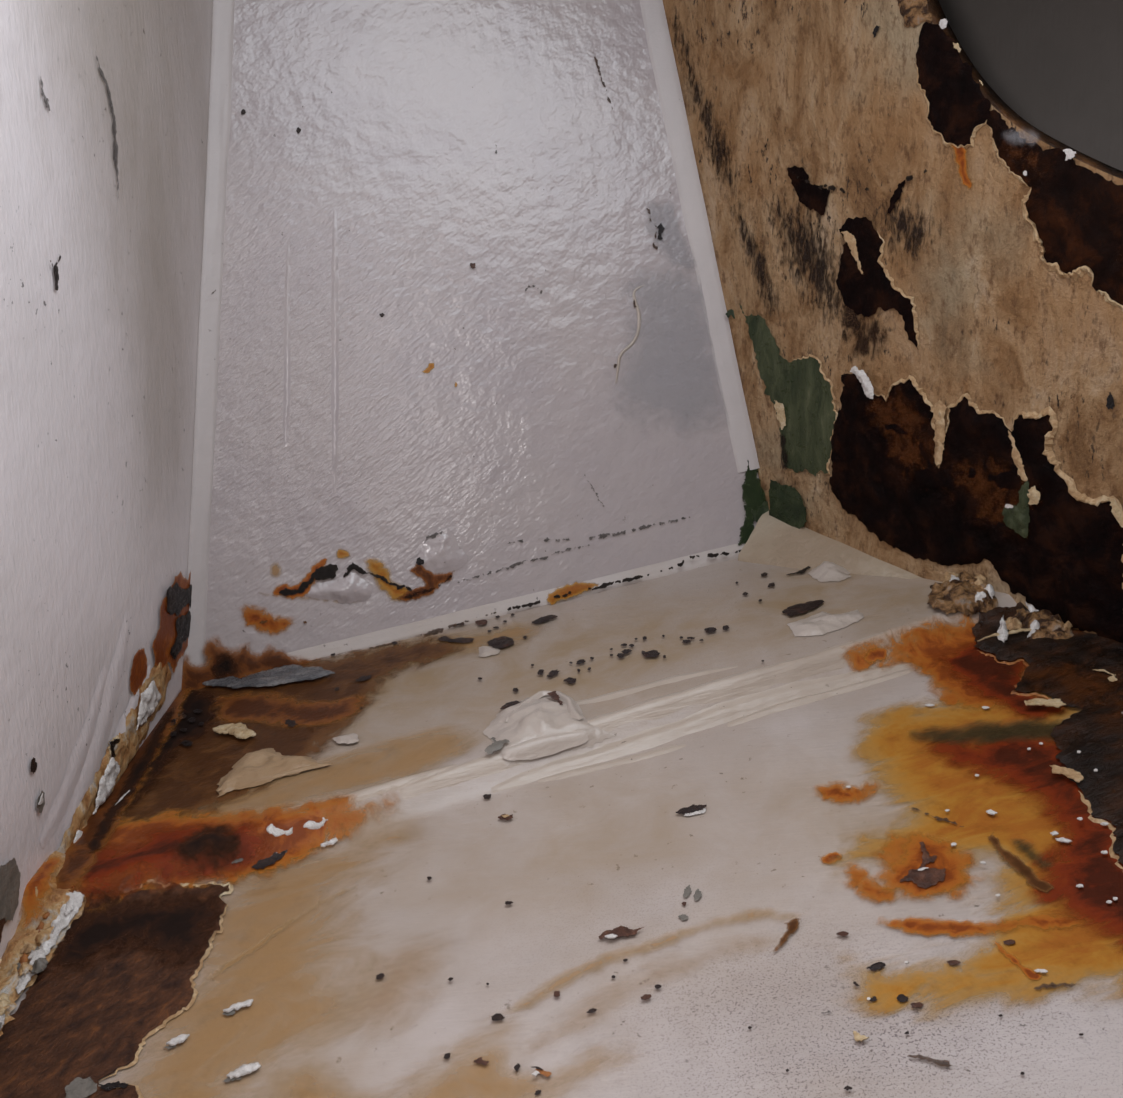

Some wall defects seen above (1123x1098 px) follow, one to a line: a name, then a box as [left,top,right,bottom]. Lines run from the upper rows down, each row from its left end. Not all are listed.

crack [96,56,119,190]
spalling [916,18,1123,312]
spalling [0,662,234,1098]
peeling [213,722,256,739]
corrosion [55,571,544,1098]
corrosion [522,932,682,1006]
corrosion [774,918,800,951]
peeling [782,600,824,616]
corrosion [816,614,1123,1014]
spalling [829,217,1123,869]